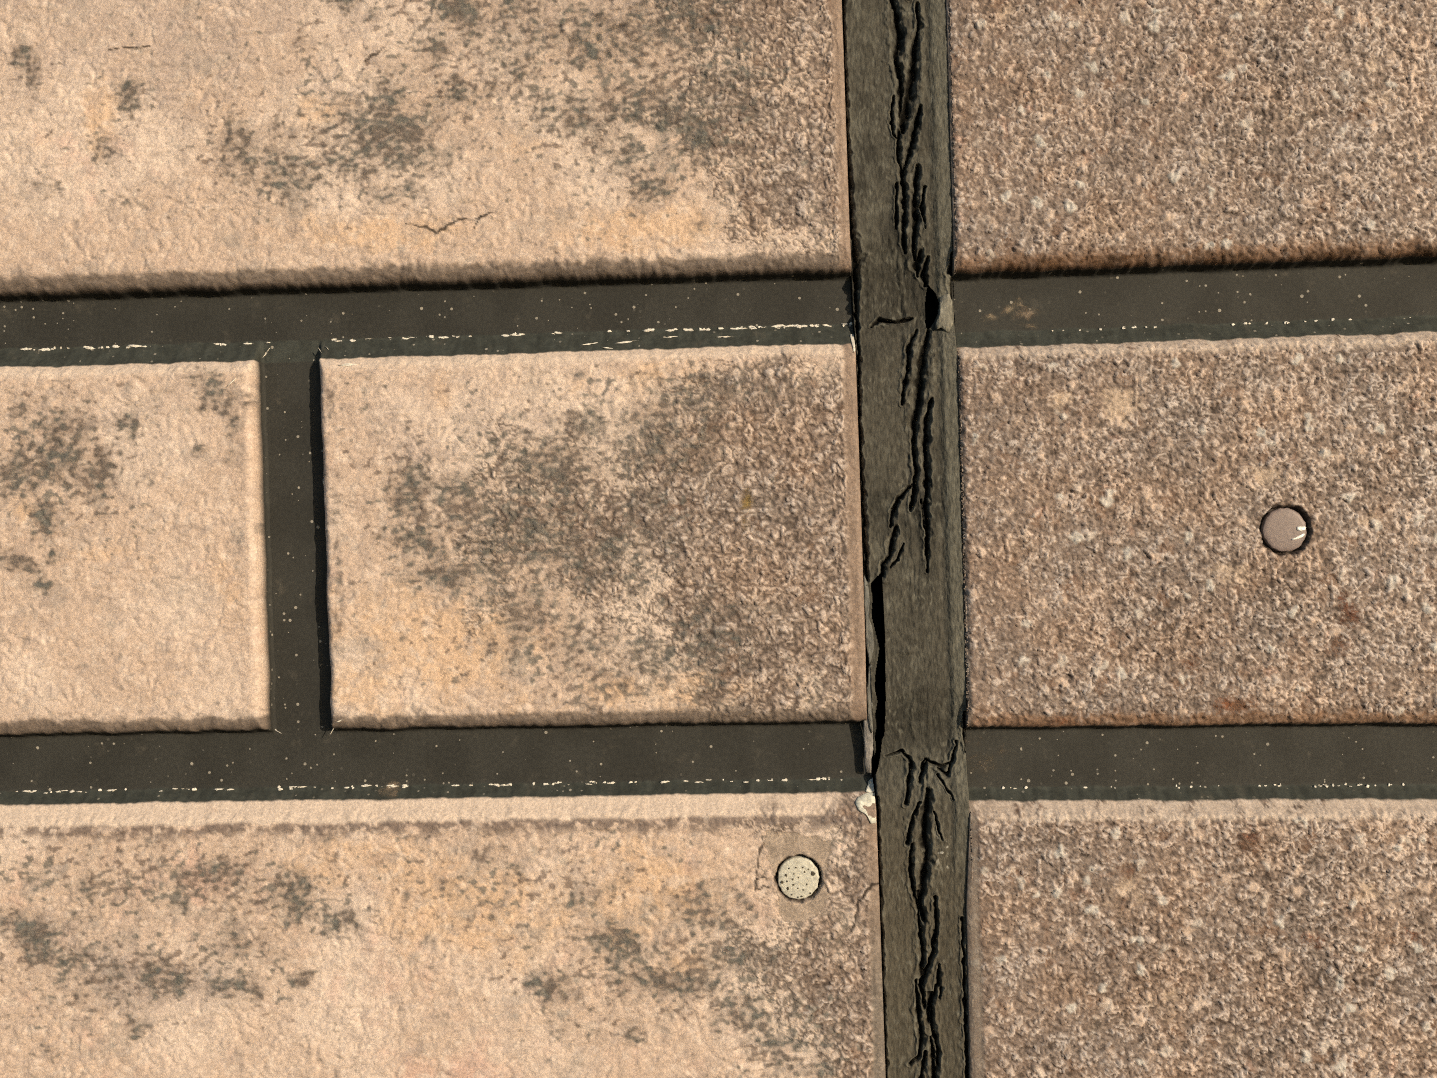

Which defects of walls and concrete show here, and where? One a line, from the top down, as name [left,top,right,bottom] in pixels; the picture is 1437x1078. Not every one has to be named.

damp [221,81,460,205]
damp [424,0,772,202]
crack [890,0,952,300]
crack [842,0,932,580]
damp [0,410,121,535]
damp [377,464,480,588]
damp [484,376,733,641]
damp [106,958,263,1039]
damp [275,873,358,935]
damp [524,970,567,1009]
damp [589,881,835,1078]
crack [851,711,968,1078]